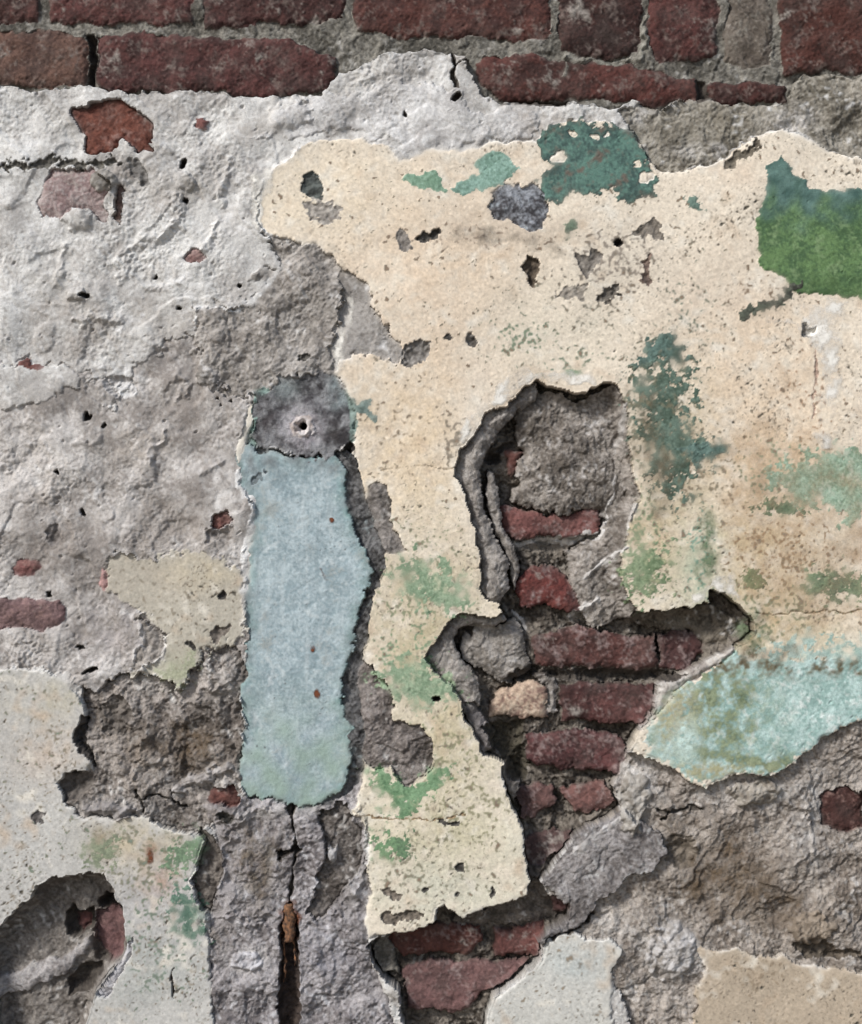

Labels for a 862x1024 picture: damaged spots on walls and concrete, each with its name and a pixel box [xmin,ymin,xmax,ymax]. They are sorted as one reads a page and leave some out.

peeling [329,269,432,372]
peeling [627,332,732,501]
peeling [366,482,407,563]
peeling [395,556,476,618]
peeling [616,543,678,604]
peeling [358,656,464,820]
peeling [644,627,862,784]
crack [285,803,299,901]
flaking render [819,785,862,834]
flaking render [0,828,134,1024]
corrosion [282,902,300,982]
peeling [371,954,405,1024]